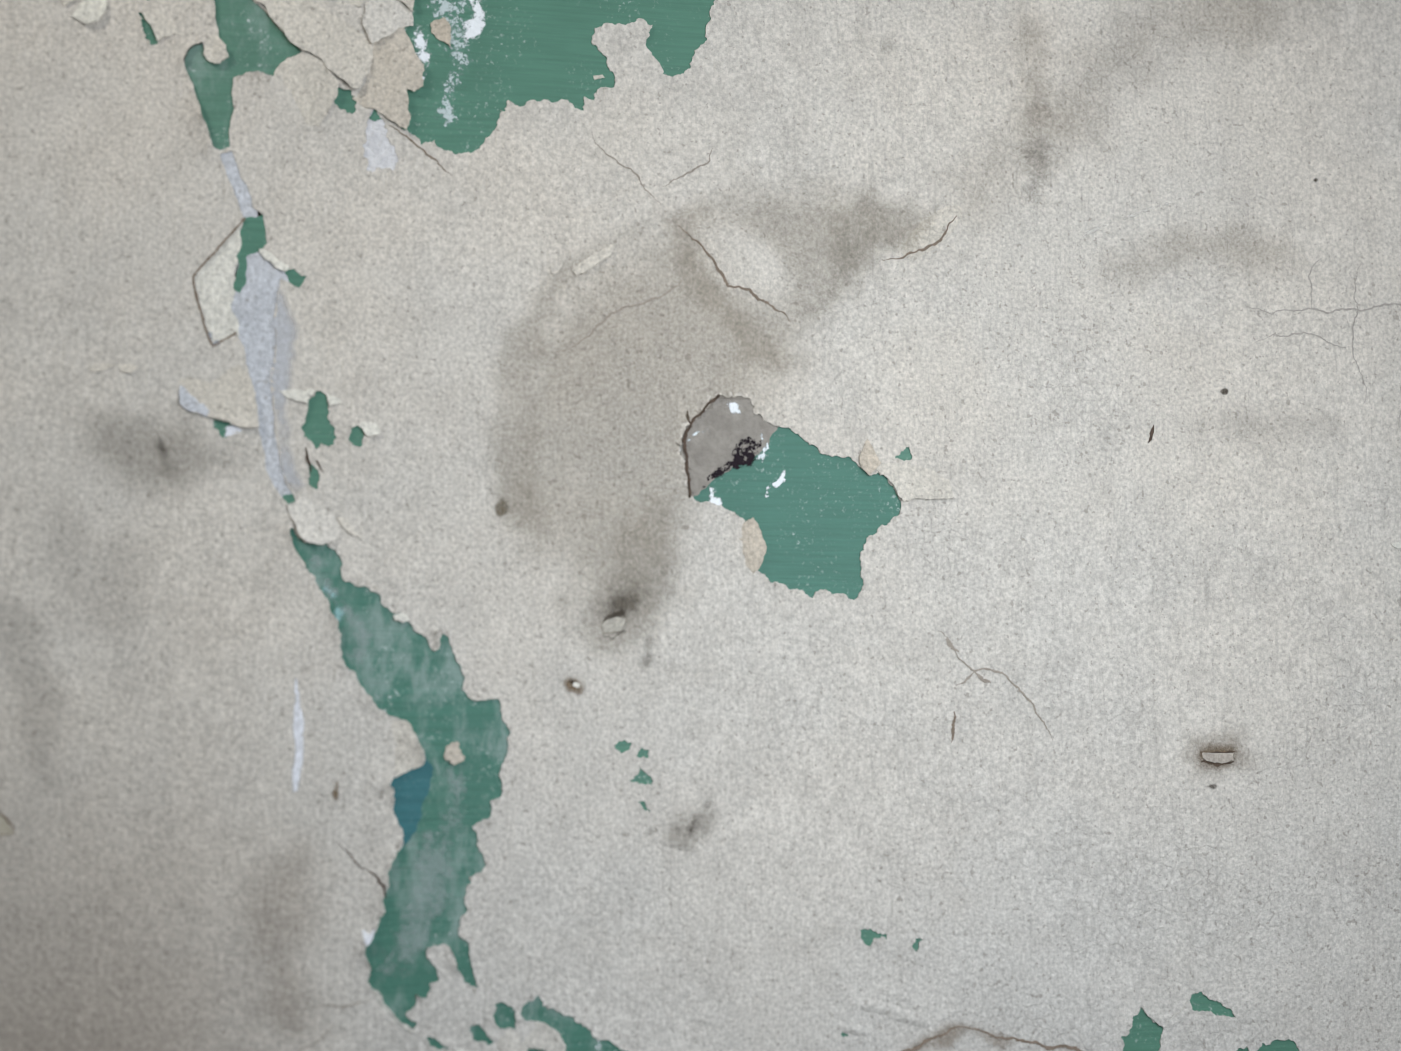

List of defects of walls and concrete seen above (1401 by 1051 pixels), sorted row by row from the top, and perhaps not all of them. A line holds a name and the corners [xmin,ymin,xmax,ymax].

crack [556,133,791,352]
crack [884,216,957,261]
peeling [139,0,715,1051]
peeling [675,394,954,600]
crack [902,1026,1082,1051]
peeling [1121,992,1235,1051]
peeling [1237,1039,1299,1051]